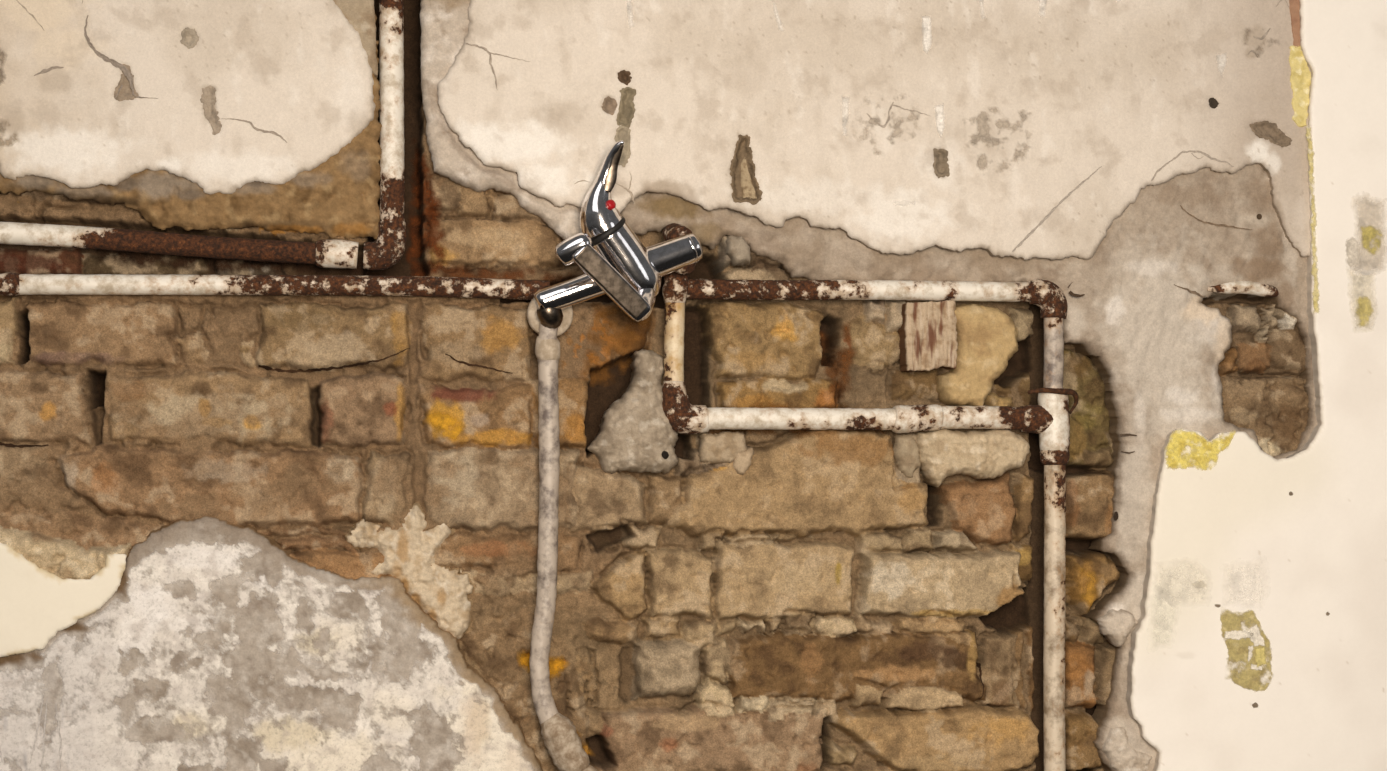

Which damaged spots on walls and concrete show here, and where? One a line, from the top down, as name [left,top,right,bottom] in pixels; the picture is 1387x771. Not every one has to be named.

crack [16,0,44,31]
crack [34,66,64,76]
crack [82,1,158,99]
crack [466,43,530,89]
crack [221,118,287,143]
flaking render [0,0,584,281]
crack [1151,150,1234,181]
crack [1012,166,1102,252]
flaking render [549,0,1319,771]
flaking render [0,295,559,771]